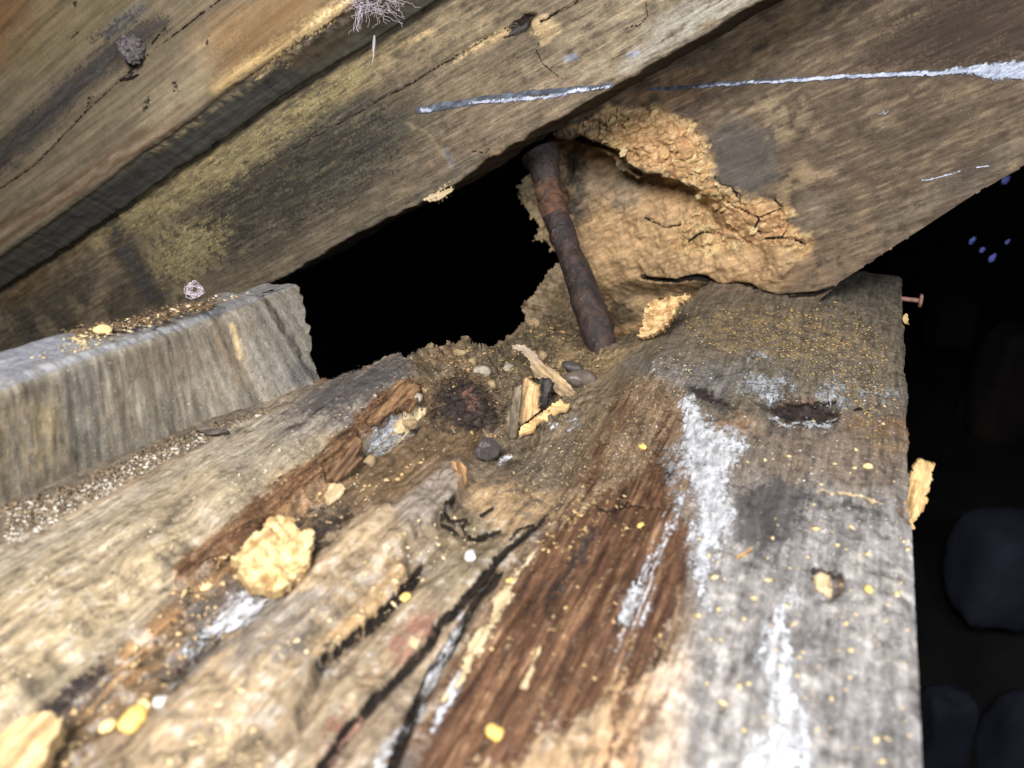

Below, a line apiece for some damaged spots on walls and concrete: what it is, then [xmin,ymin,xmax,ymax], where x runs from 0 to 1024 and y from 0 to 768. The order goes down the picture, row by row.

crack [644,217,714,242]
crack [714,176,806,245]
leakage [737,351,903,429]
leakage [607,394,884,768]
crack [314,495,545,768]